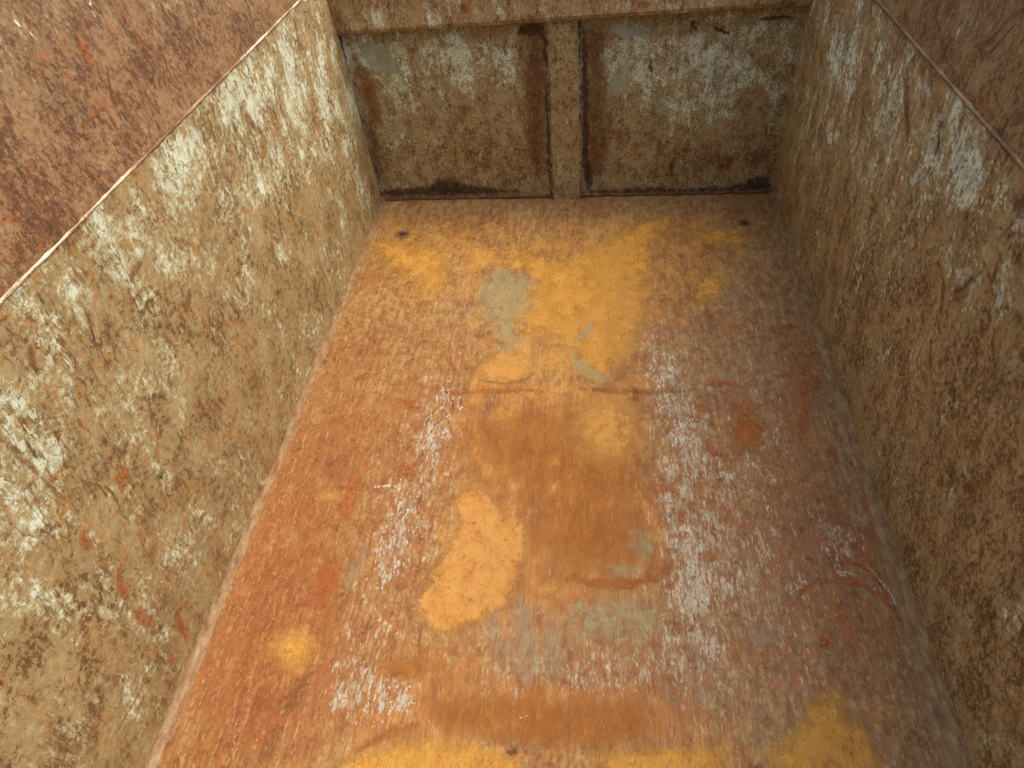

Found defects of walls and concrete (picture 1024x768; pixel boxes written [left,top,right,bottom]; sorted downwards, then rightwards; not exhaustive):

corrosion [354,58,380,176]
corrosion [542,35,551,187]
corrosion [581,28,592,190]
corrosion [377,241,447,293]
corrosion [437,352,529,394]
corrosion [498,219,676,400]
peeling [361,379,464,599]
corrosion [418,488,526,632]
peeling [647,332,725,677]
corrosion [344,741,520,768]
corrosion [606,748,730,768]
corrosion [769,690,883,768]